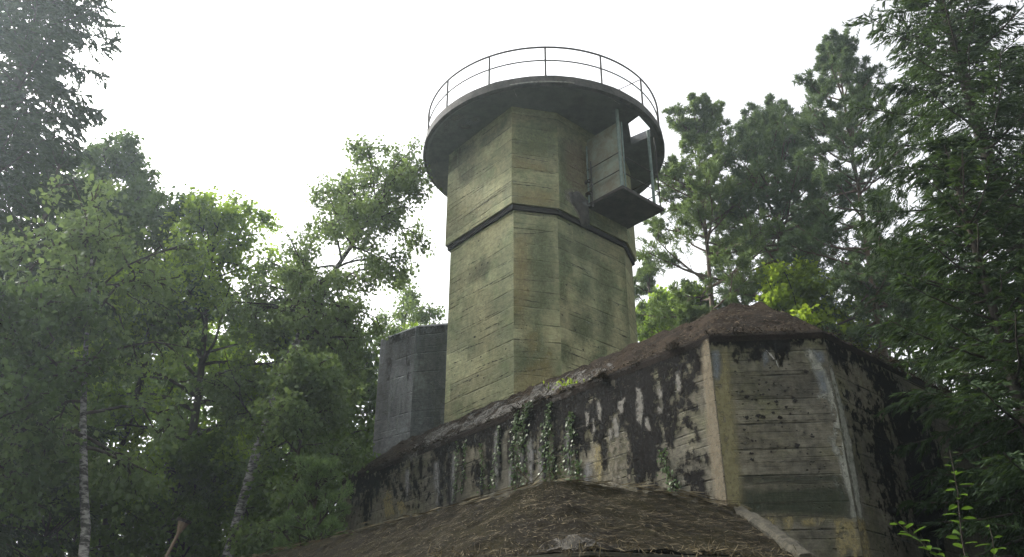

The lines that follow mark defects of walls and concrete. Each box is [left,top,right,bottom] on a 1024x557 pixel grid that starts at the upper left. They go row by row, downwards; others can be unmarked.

water stain [345,325,947,557]